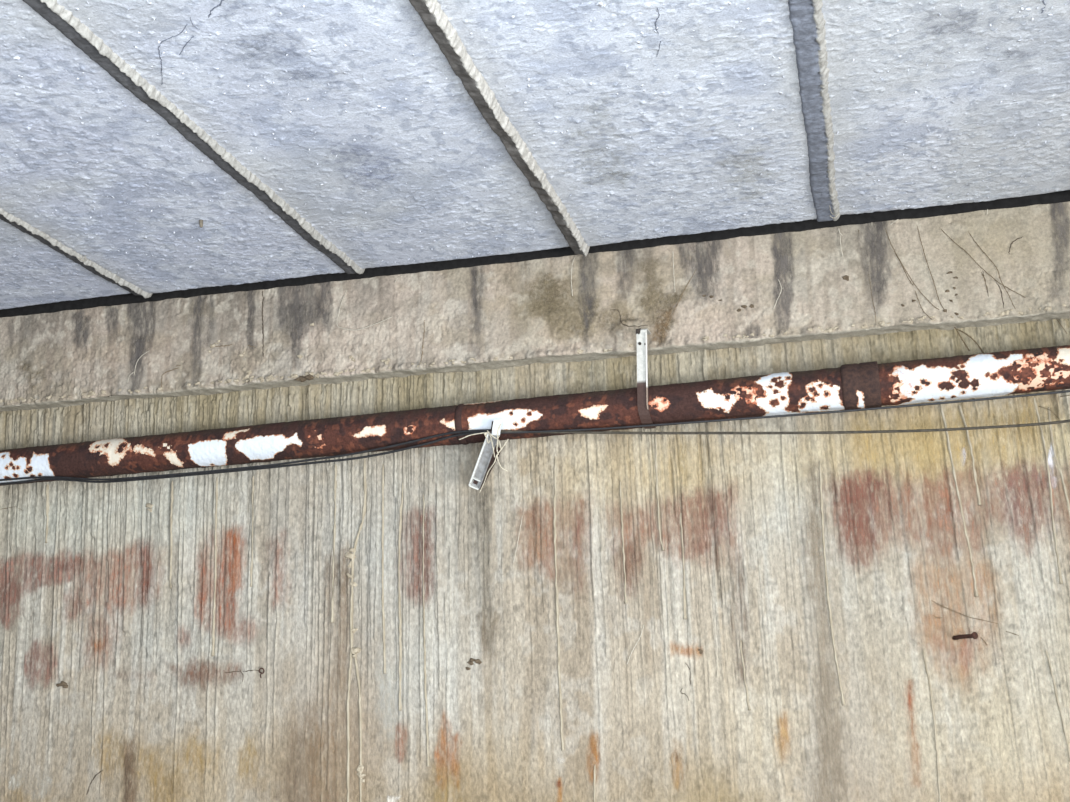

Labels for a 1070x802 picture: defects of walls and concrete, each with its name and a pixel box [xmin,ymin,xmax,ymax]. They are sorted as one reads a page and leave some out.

crack [158,0,224,85]
leakage [73,311,89,345]
leakage [108,301,155,389]
leakage [192,295,213,365]
flaking render [187,355,392,386]
leakage [279,282,331,347]
leakage [471,266,481,331]
leakage [680,243,715,286]
leakage [773,232,793,325]
peeling [856,390,865,409]
leakage [865,222,887,294]
corrosion [199,535,237,631]